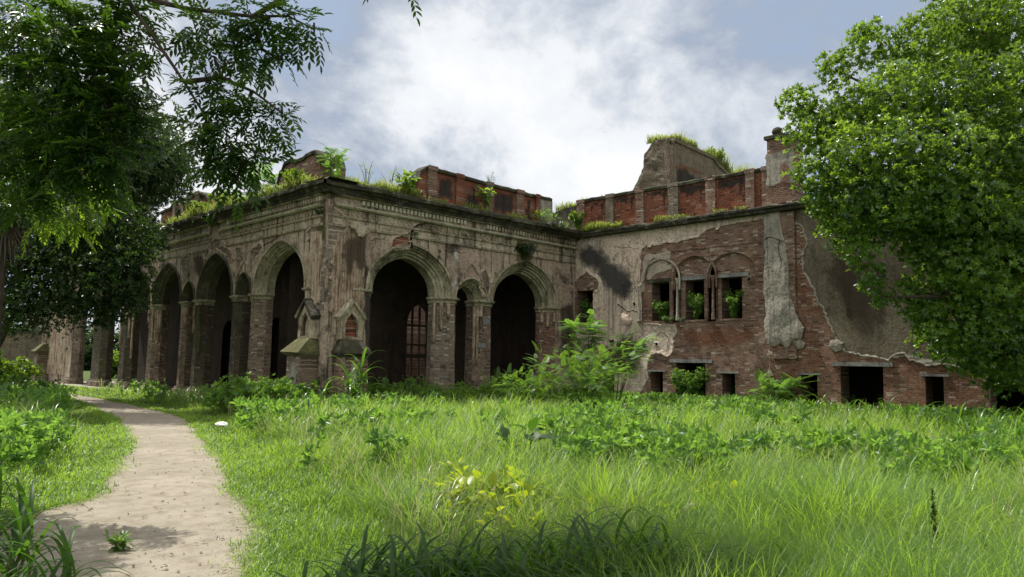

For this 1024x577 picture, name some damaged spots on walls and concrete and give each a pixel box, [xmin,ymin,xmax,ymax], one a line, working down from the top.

damp [342,236,371,349]
damp [580,238,632,298]
peeling [616,214,991,409]